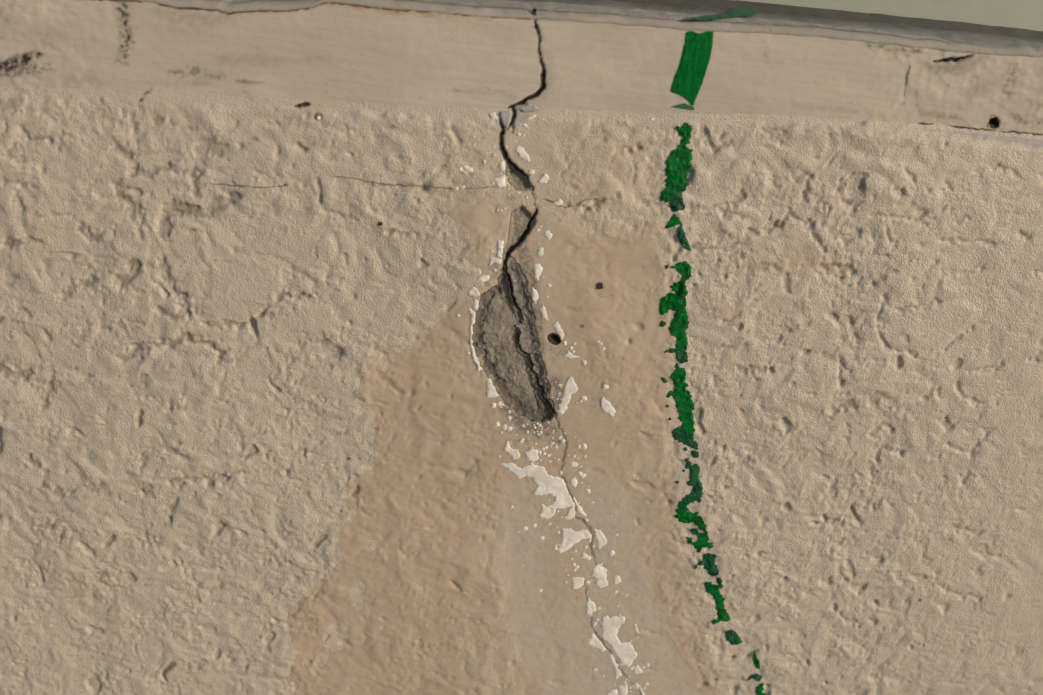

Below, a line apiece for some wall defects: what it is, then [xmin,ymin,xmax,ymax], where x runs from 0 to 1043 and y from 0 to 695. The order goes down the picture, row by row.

crack [99,0,640,692]
leakage [287,181,718,695]
spalling [455,103,650,695]